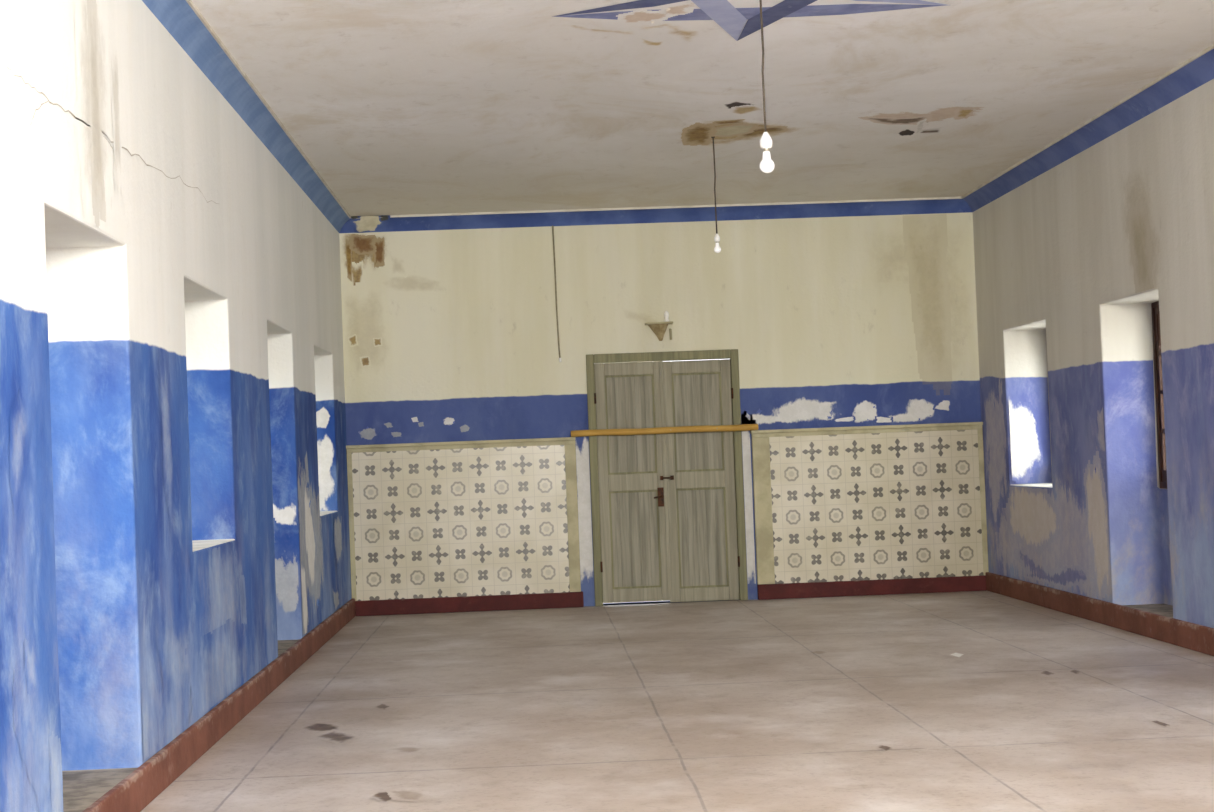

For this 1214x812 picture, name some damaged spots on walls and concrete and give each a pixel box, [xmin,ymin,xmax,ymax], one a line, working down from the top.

damp [74,0,124,231]
crack [7,67,218,204]
damp [666,116,813,149]
peeling [273,405,343,635]
peeling [356,416,424,441]
peeling [442,417,472,433]
peeling [741,395,952,584]